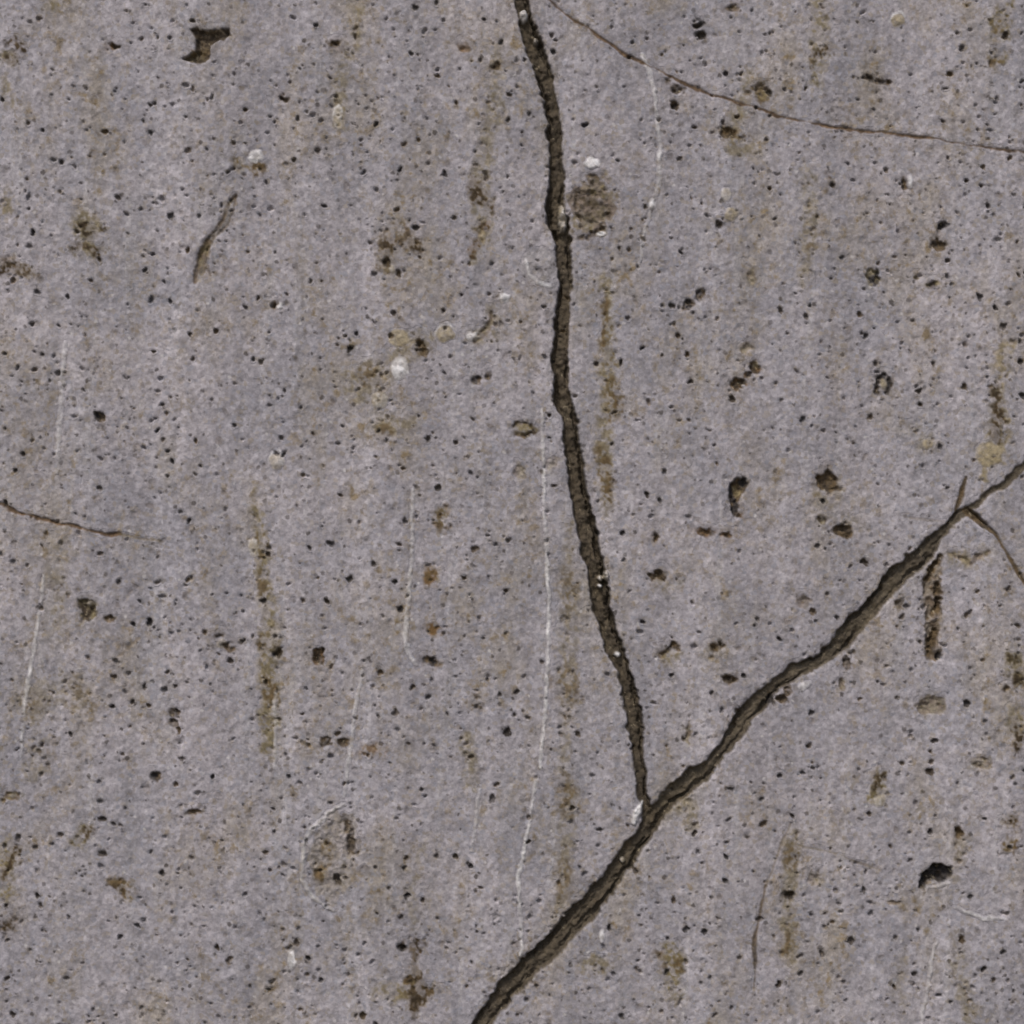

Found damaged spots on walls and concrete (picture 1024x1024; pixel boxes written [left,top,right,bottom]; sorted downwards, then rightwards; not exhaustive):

crack [0,501,160,544]
crack [466,0,1024,1024]